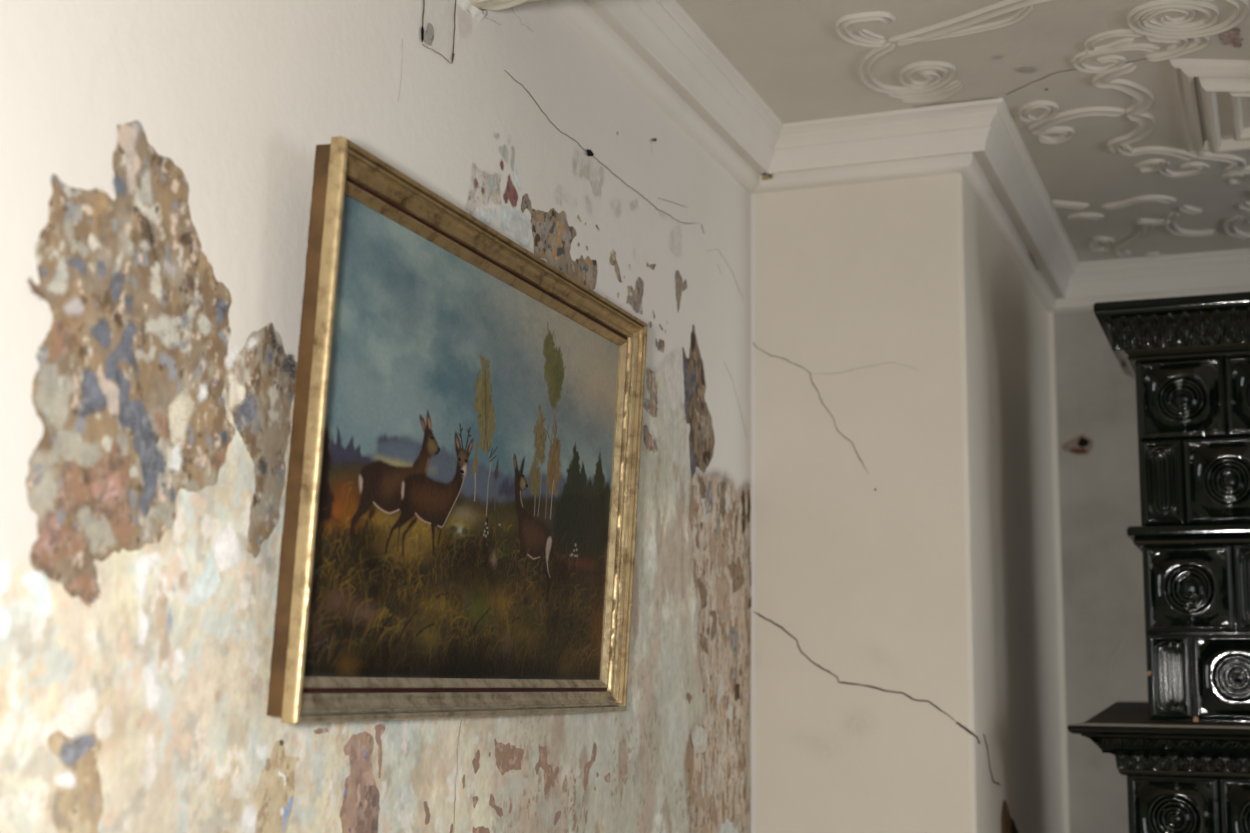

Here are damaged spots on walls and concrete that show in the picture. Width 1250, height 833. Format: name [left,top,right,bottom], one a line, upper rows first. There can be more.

crack [913,69,1077,108]
crack [504,70,744,300]
peeling [466,132,687,453]
peeling [0,120,297,733]
crack [753,342,919,474]
spalling [682,324,751,833]
crack [753,611,1000,785]
peeling [47,730,104,833]
peeling [218,740,305,833]
peeling [340,724,385,833]
peeling [462,735,613,825]